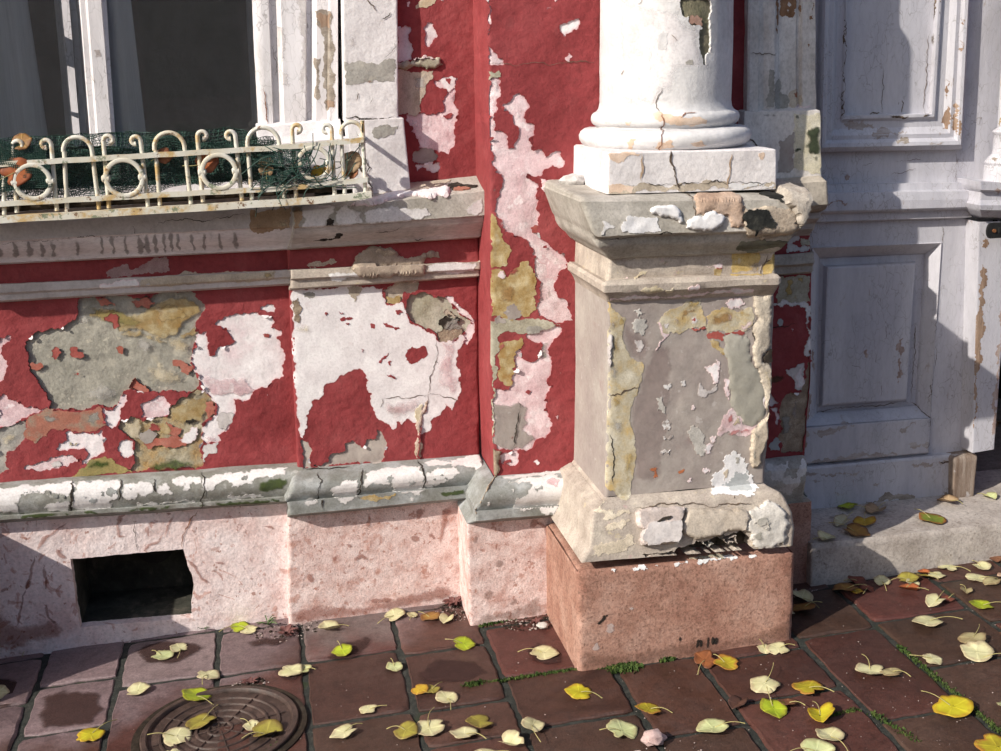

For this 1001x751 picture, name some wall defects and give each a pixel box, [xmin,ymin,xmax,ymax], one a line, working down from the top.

peeling [297,0,336,111]
peeling [560,18,580,36]
peeling [620,0,710,127]
peeling [301,22,478,241]
crack [628,91,770,216]
peeling [0,77,573,516]
flaking render [592,69,897,567]
peeling [973,267,988,428]
crack [67,480,75,511]
crack [181,472,205,548]
crack [310,466,363,508]
crack [634,496,748,509]